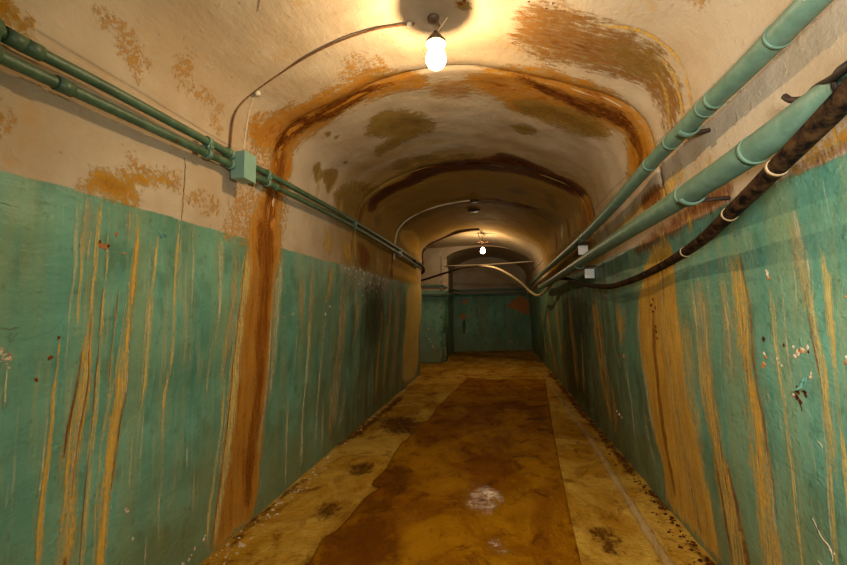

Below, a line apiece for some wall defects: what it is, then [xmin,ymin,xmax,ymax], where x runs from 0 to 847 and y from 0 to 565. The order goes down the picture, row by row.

water stain [365,109,436,156]
rust [78,0,692,551]
water stain [336,397,419,446]
rust [635,185,750,565]
rust [721,259,785,565]
peeling [783,343,809,359]
peeling [792,372,812,410]
water stain [351,462,374,475]
water stain [304,466,410,565]
water stain [589,527,626,555]